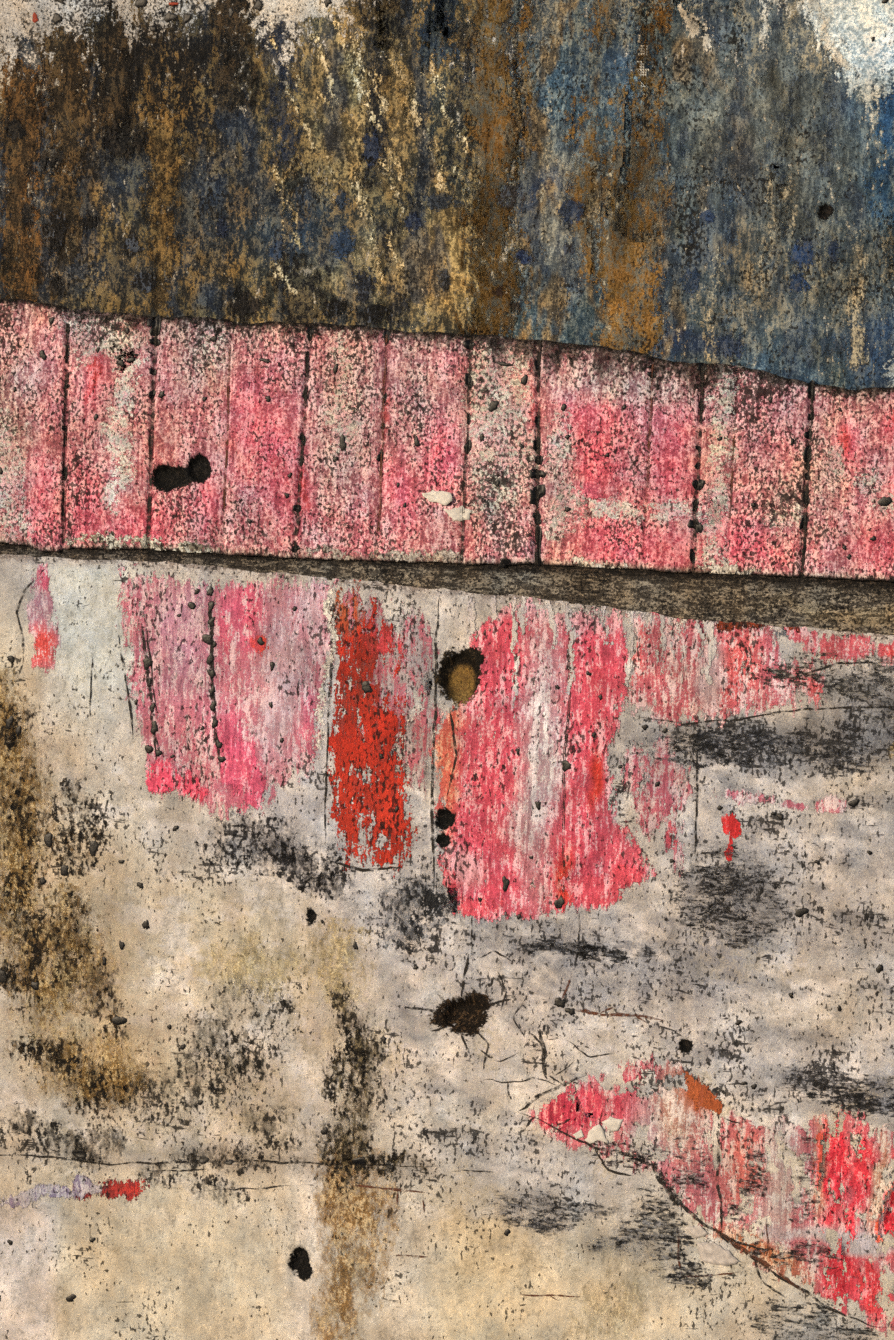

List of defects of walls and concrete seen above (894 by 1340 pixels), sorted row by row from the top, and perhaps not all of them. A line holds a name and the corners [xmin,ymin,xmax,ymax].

leakage [0,0,894,412]
leakage [333,434,346,462]
leakage [878,496,893,506]
leakage [0,695,128,1042]
leakage [0,877,460,1205]
rust [310,1127,399,1340]
peeling [114,563,894,924]
leakage [554,998,575,1015]
crack [470,621,894,1328]
peeling [526,1052,894,1337]